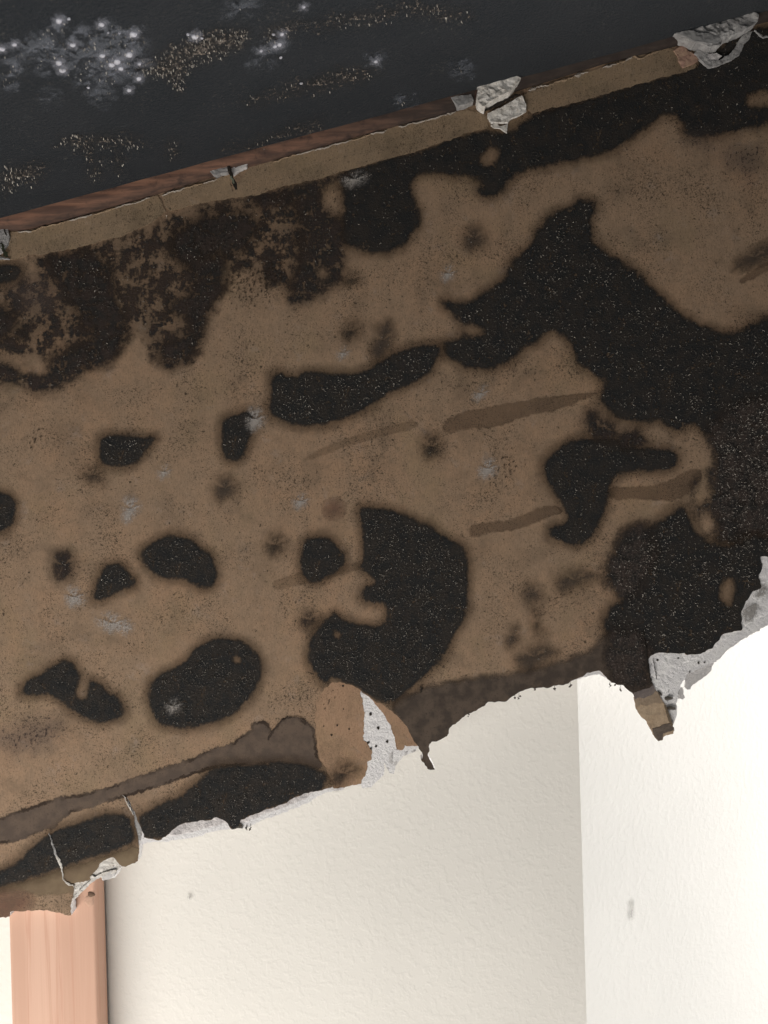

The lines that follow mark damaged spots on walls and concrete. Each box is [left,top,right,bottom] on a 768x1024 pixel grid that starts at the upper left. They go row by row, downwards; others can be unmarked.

flaking render [694,32,752,69]
flaking render [451,94,474,111]
flaking render [487,95,526,134]
damp [0,18,768,392]
damp [88,434,156,481]
damp [220,198,768,770]
damp [140,534,218,590]
damp [21,659,125,724]
damp [147,637,263,730]
crack [122,795,142,841]
damp [0,716,328,918]
crack [48,834,75,888]